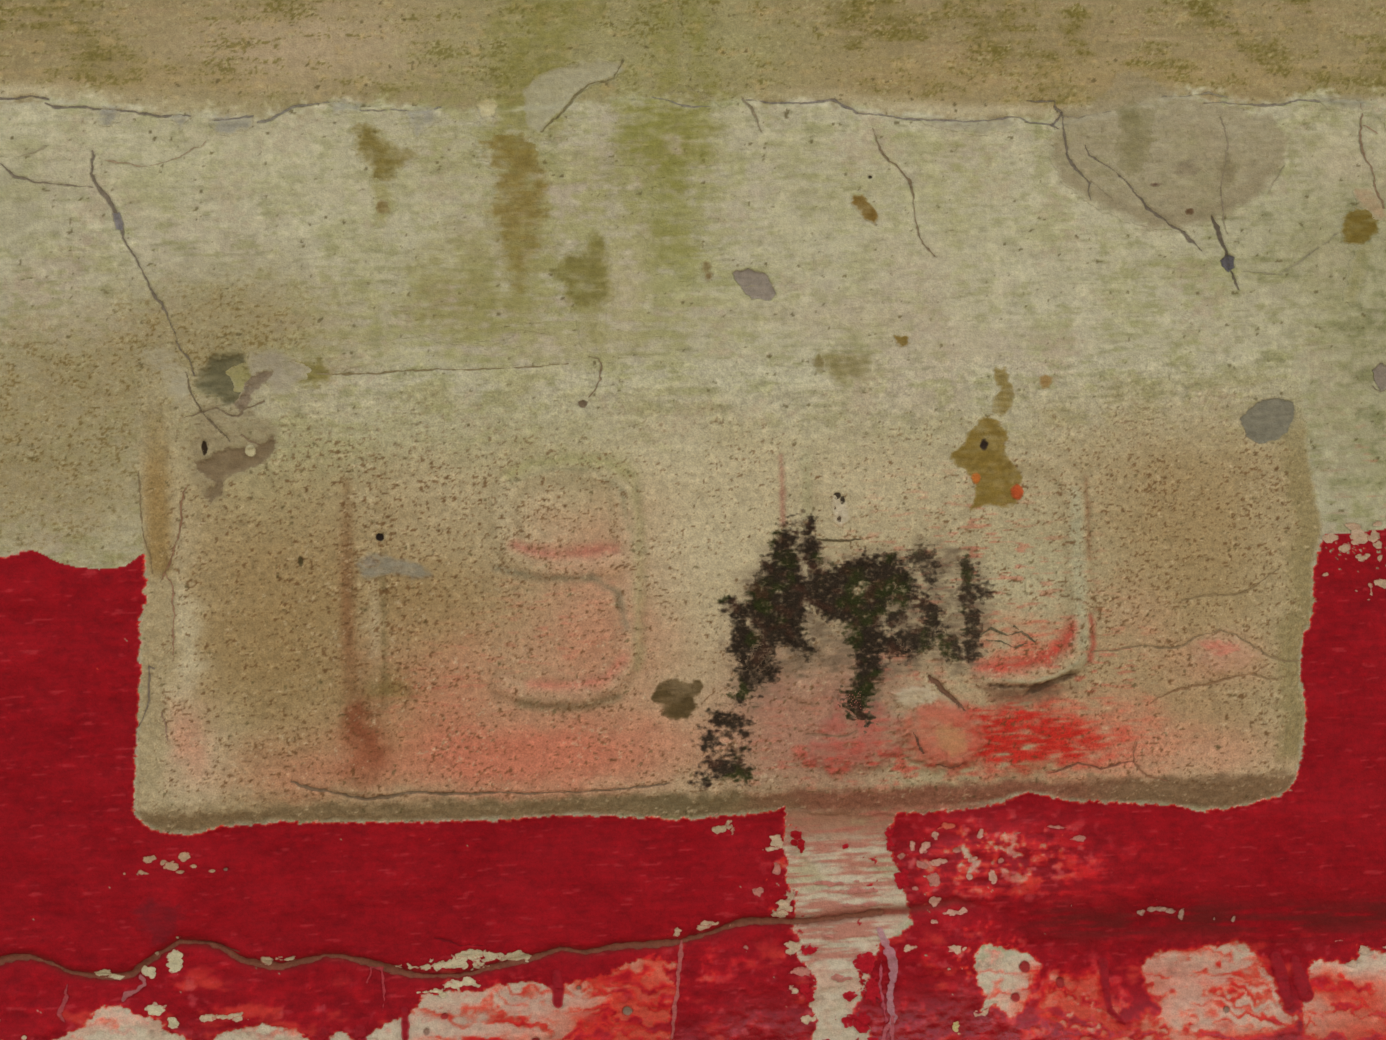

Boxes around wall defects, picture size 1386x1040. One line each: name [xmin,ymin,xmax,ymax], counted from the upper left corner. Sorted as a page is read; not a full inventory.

crack [0,95,443,376]
damp [349,119,419,231]
damp [381,125,615,362]
crack [742,91,1385,290]
damp [1047,69,1292,232]
spalling [132,343,312,511]
damp [687,508,1035,794]
peeling [141,936,184,979]
crack [0,909,884,980]
peeling [394,949,532,998]
peeling [831,951,882,1040]
peeling [814,822,1004,924]